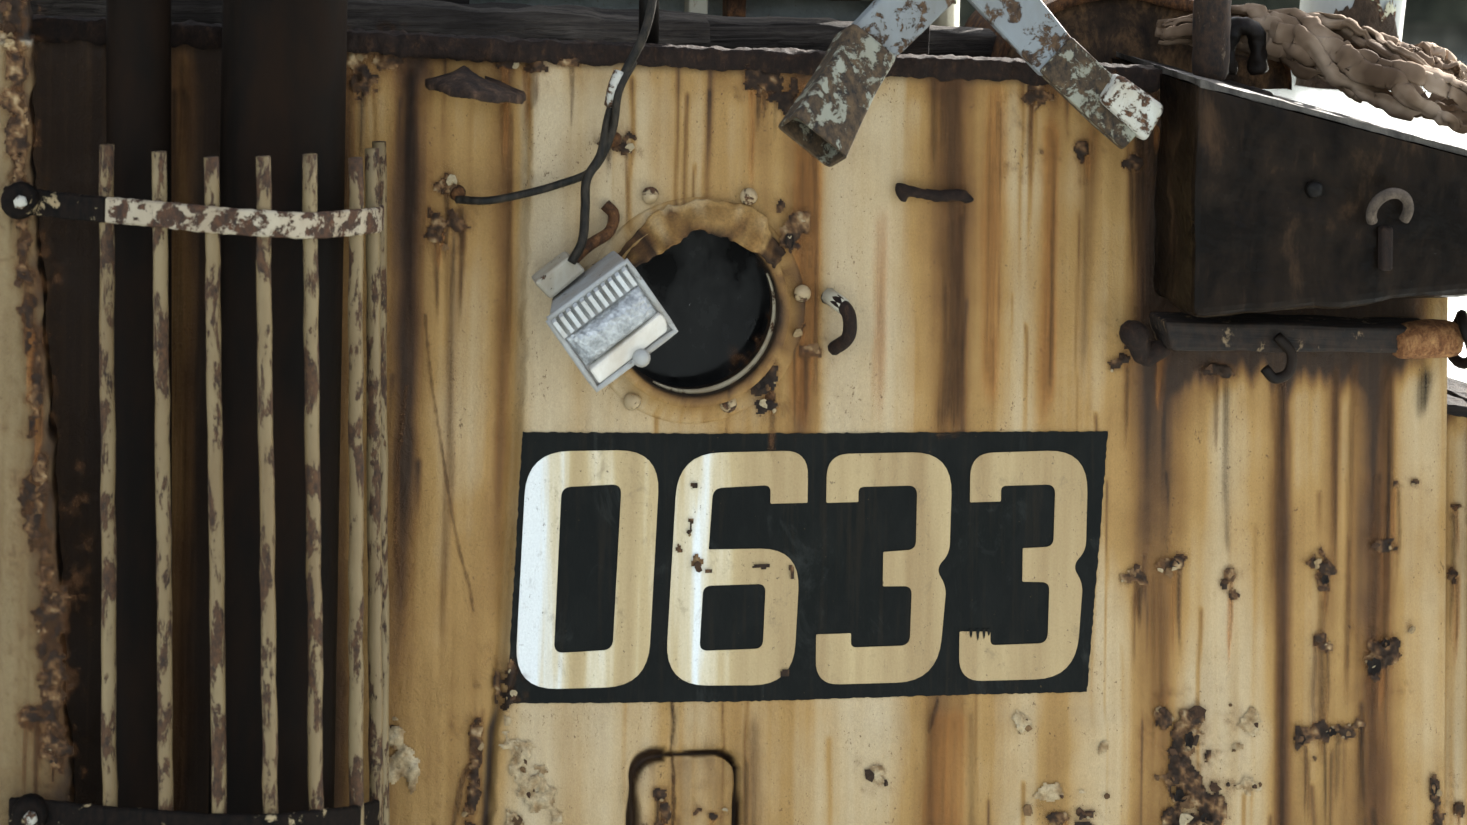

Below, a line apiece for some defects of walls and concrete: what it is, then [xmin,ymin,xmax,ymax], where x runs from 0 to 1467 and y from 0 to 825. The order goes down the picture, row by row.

corrosion [0,0,31,186]
corrosion [11,217,75,794]
corrosion [1275,377,1419,825]
peeling [389,717,420,794]
corrosion [461,717,484,825]
corrosion [1046,807,1095,825]
corrosion [1154,706,1230,825]
corrosion [1430,774,1465,825]